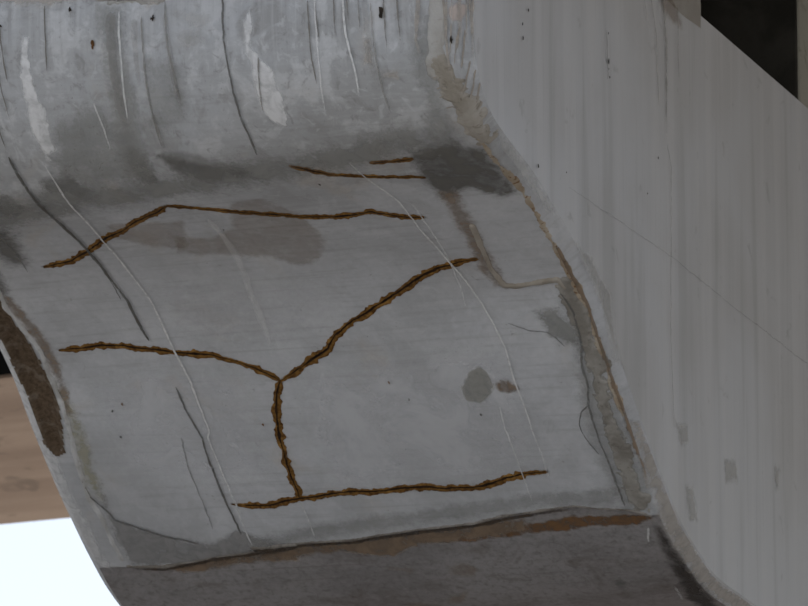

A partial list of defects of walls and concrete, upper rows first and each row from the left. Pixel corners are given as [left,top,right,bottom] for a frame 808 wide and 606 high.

crack [221,0,257,155]
spalling [0,301,107,566]
leakage [0,129,541,543]
crack [0,157,548,544]
rust [143,509,651,573]
spalling [462,367,493,403]